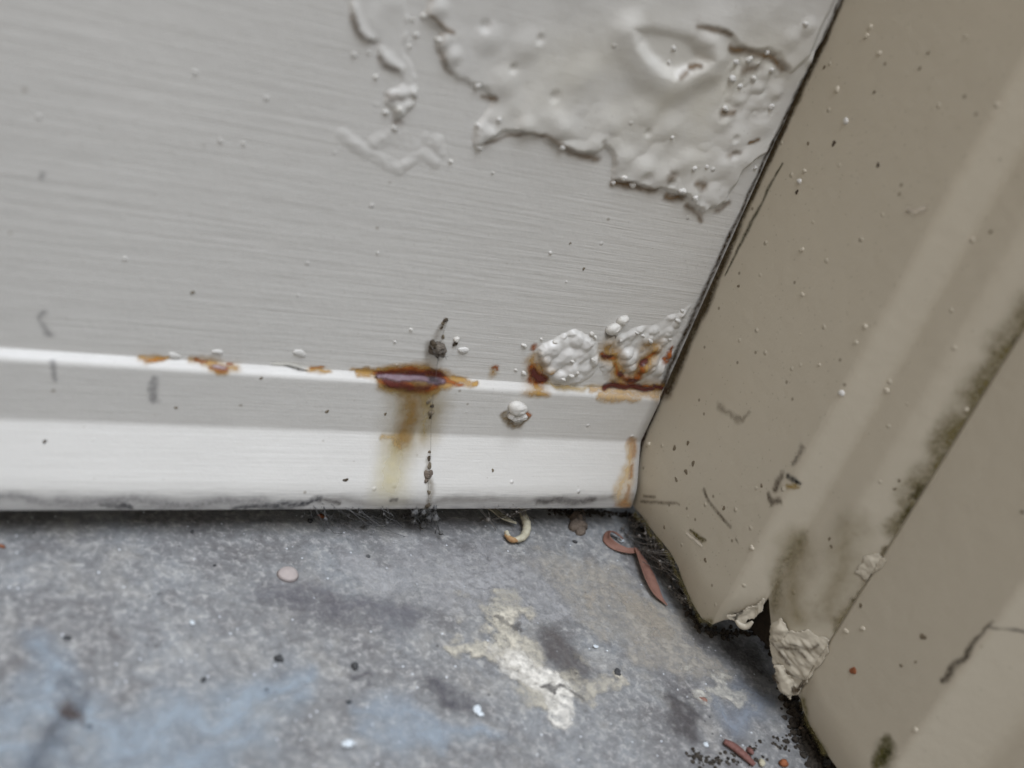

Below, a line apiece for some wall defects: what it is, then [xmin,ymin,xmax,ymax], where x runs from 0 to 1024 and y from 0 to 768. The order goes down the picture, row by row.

rust [189,358,238,375]
rust [528,344,554,396]
rust [590,343,673,402]
rust [351,364,478,486]
water stain [890,310,1024,533]
peeling [726,598,765,630]
peeling [769,618,830,700]
crack [941,625,1024,683]